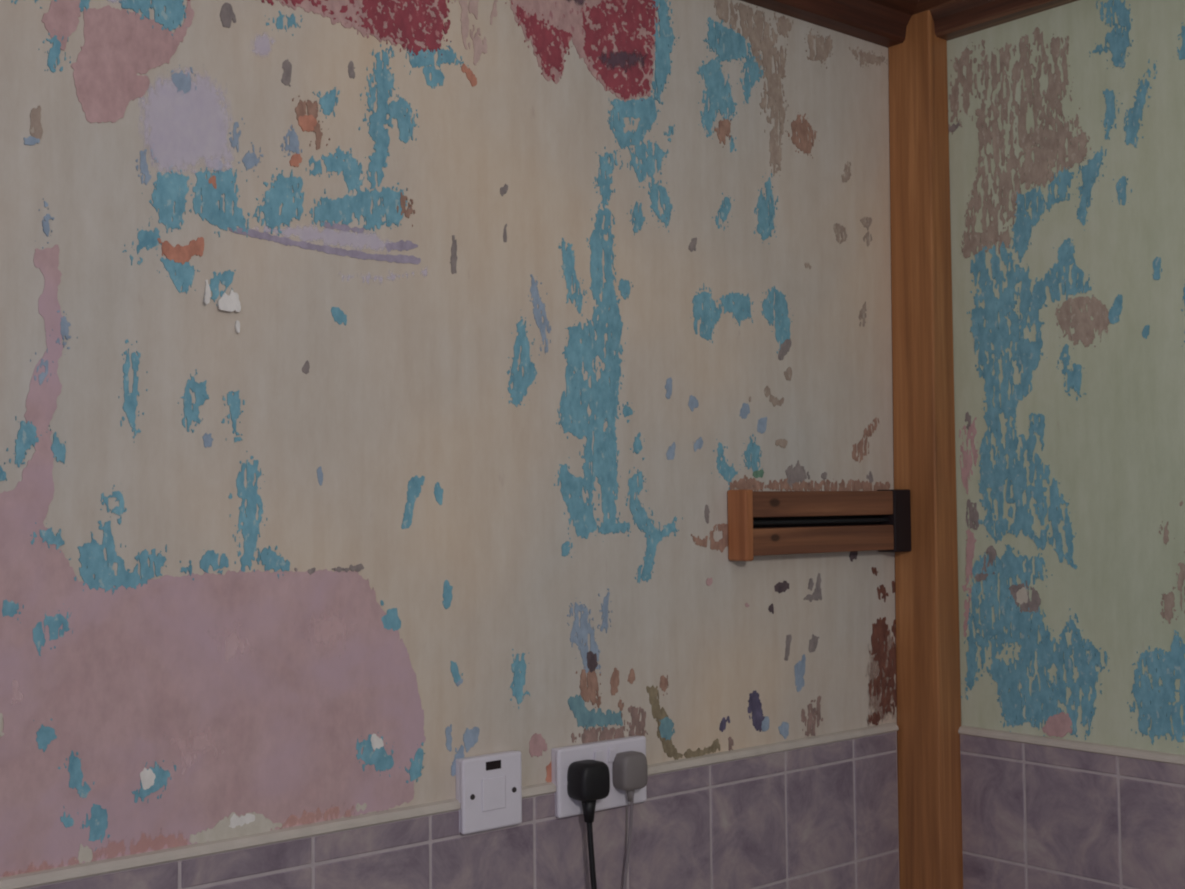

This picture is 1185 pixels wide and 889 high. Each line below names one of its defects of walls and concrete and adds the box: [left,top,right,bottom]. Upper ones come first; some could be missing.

peeling [123,42,477,333]
peeling [697,0,820,244]
peeling [1089,0,1133,69]
flaking render [0,198,426,877]
peeling [401,475,443,529]
peeling [502,0,728,584]
peeling [693,386,784,490]
peeling [692,283,793,381]
peeling [948,27,1157,740]
peeling [646,675,734,760]
peeling [748,690,823,739]
peeling [1127,551,1185,748]